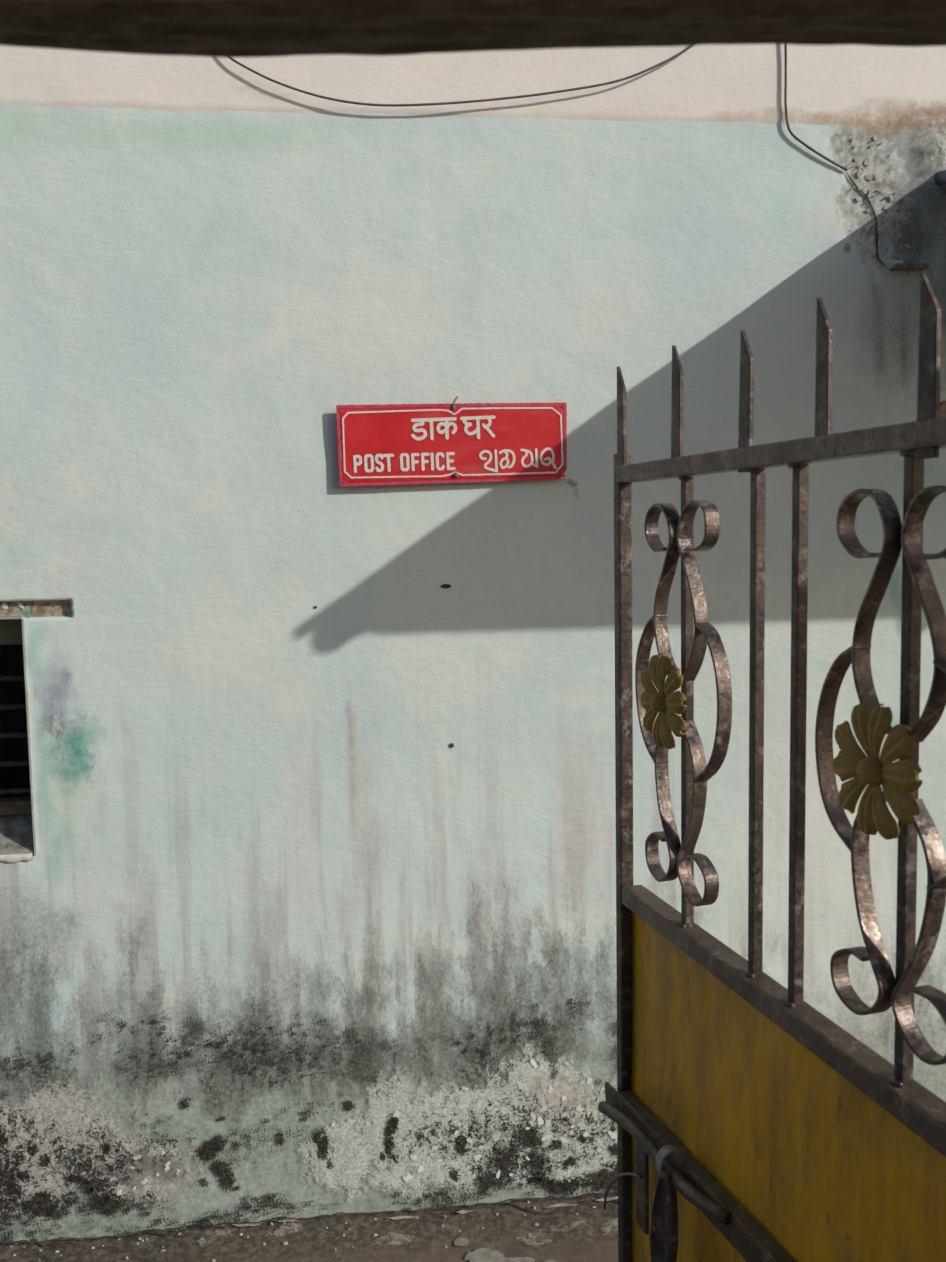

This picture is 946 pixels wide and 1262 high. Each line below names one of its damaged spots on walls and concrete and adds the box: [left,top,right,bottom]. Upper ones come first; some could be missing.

water stain [0,935,618,1246]